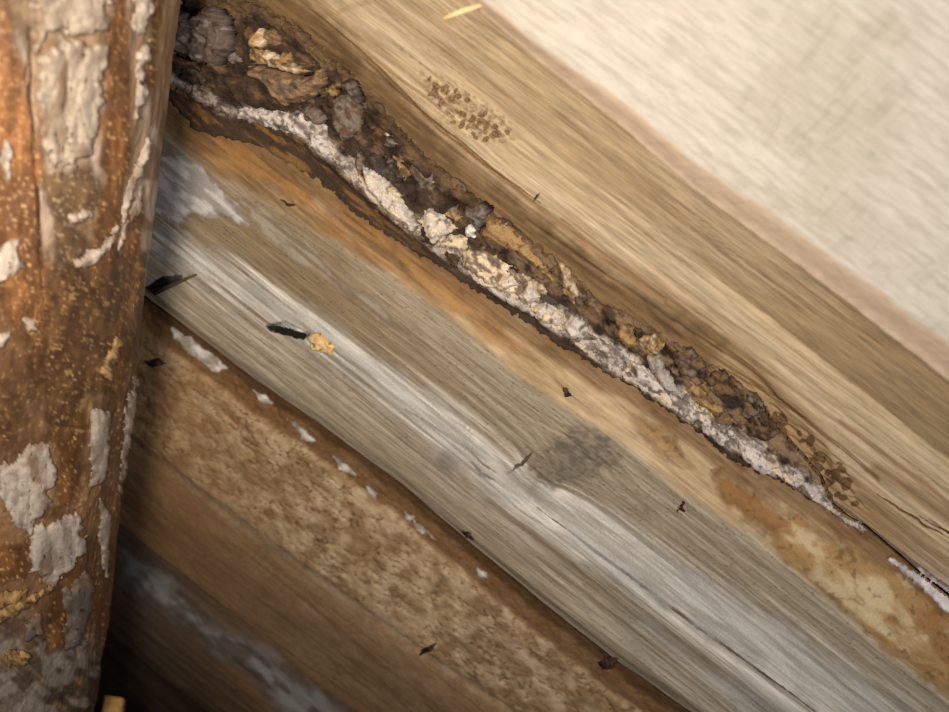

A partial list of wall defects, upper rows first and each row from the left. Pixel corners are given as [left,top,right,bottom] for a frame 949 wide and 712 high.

peeling [172,6,436,190]
peeling [444,201,587,306]
damp [171,327,227,372]
peeling [615,320,780,441]
damp [292,422,316,442]
damp [333,456,355,474]
damp [405,512,433,538]
damp [889,558,949,612]
damp [129,560,338,712]